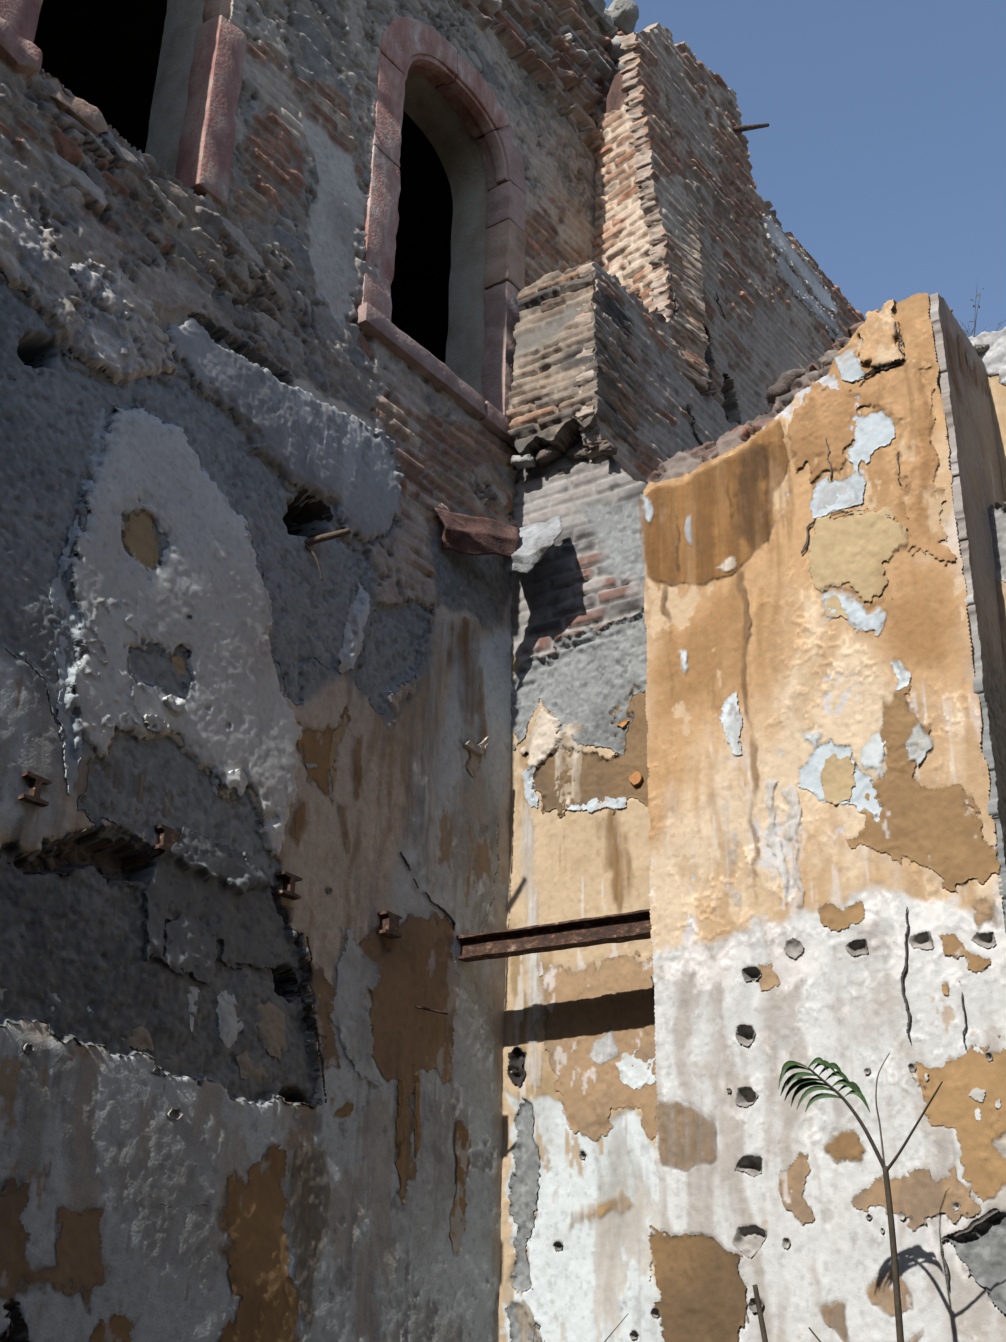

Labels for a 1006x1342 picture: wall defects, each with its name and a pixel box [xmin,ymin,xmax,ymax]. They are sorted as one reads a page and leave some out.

leakage [639,420,789,585]
peeling [760,212,957,636]
spalling [0,190,460,1204]
peeling [798,660,1000,926]
spalling [505,1047,542,1342]
peeling [538,950,716,1170]
peeling [648,1225,748,1342]
peeling [778,1151,815,1225]
peeling [823,1129,865,1163]
crack [901,907,911,1042]
peeling [851,1034,1006,1314]
peeling [939,933,991,972]